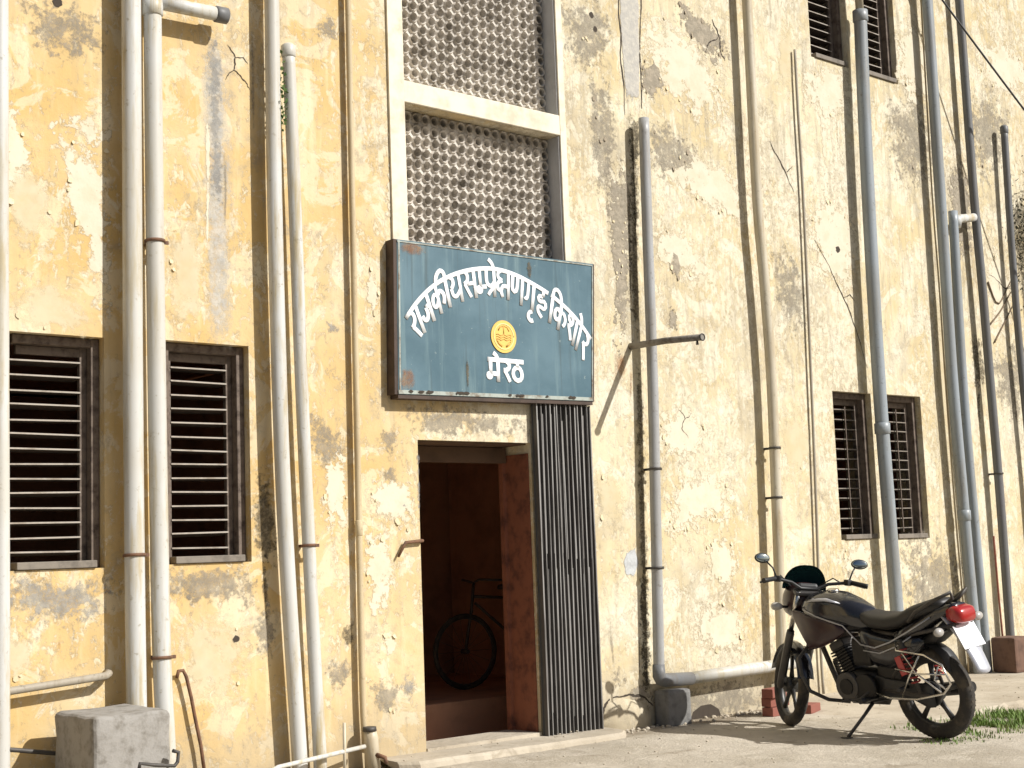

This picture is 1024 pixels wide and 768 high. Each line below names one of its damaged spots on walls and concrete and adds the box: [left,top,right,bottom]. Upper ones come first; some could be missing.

crack [226,47,250,89]
peeling [9,101,31,187]
peeling [48,114,112,317]
leakage [204,38,229,329]
leakage [628,120,696,332]
leakage [10,578,110,620]
leakage [170,473,277,652]
peeling [321,442,349,540]
peeling [364,473,417,616]
leakage [636,369,655,703]
leakage [690,678,761,718]